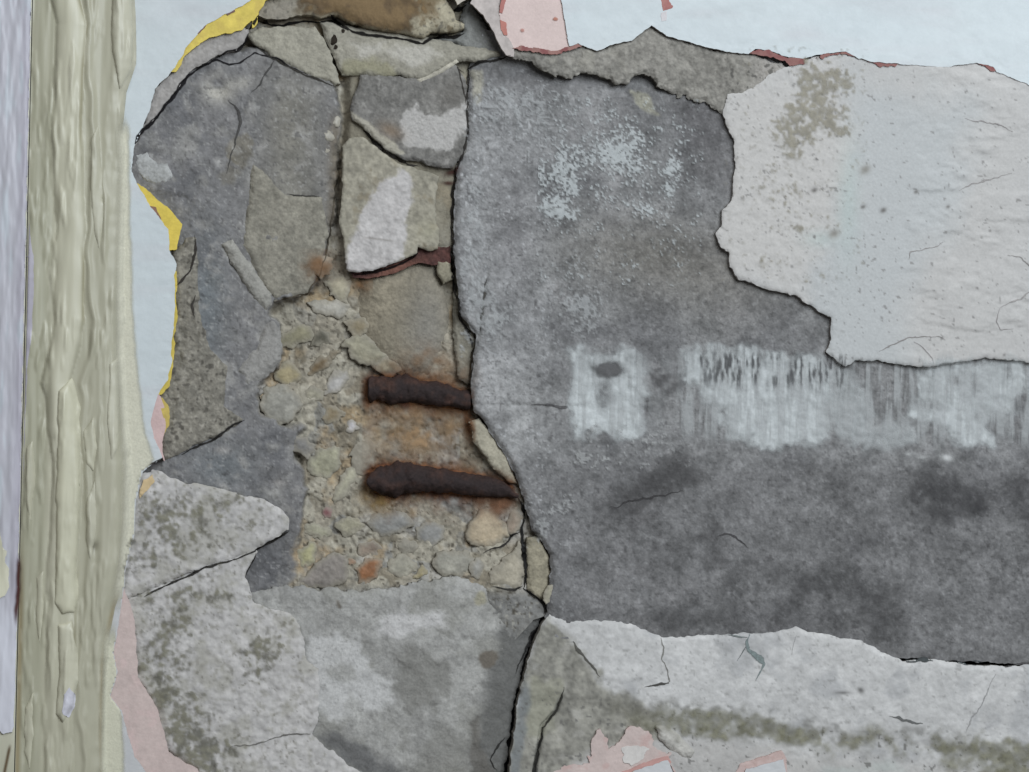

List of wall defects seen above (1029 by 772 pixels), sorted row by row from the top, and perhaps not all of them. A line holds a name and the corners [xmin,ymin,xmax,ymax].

crack [135,2,470,174]
crack [450,55,510,392]
efflorescence [538,110,703,237]
peeling [0,0,34,734]
spalling [110,0,553,772]
rust [364,371,514,513]
flaking render [367,0,1029,772]
damp [683,345,843,450]
damp [909,360,1025,447]
crack [144,531,289,597]
crack [484,498,564,772]
mould [658,709,821,744]